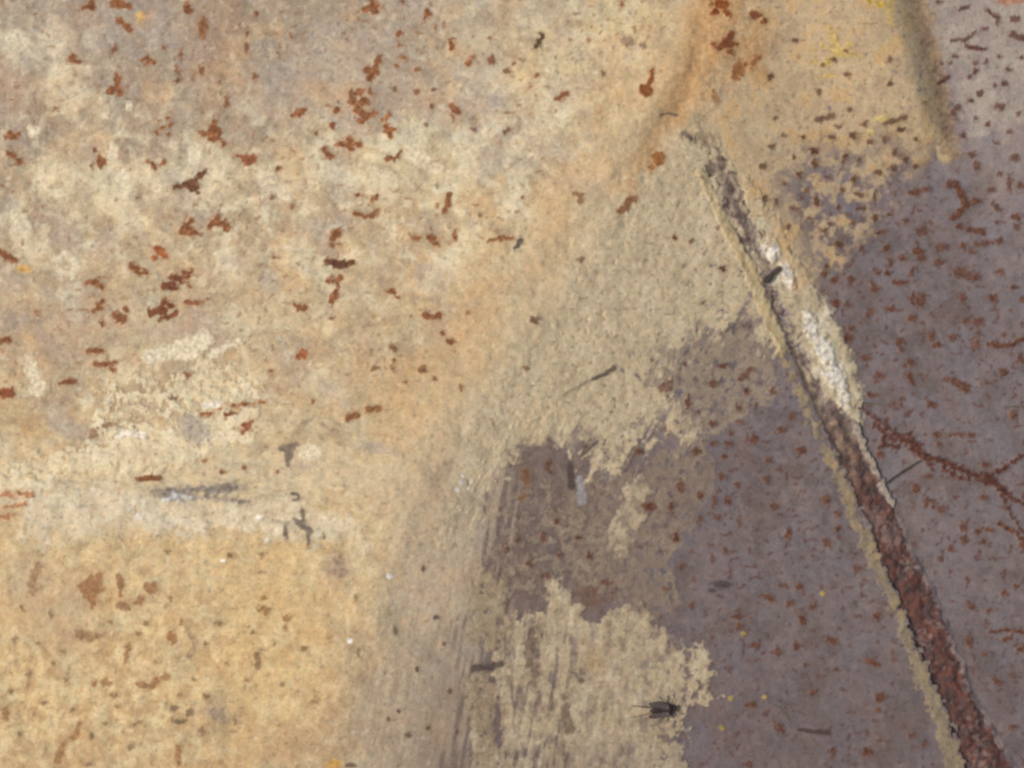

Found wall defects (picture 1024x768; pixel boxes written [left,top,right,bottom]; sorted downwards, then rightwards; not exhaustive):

rust [137,43,259,168]
rust [312,26,479,165]
rust [170,165,210,201]
rust [126,244,212,324]
rust [321,226,359,321]
damp [748,218,898,508]
crack [984,334,1024,351]
rust [198,398,269,438]
damp [566,460,589,507]
crack [855,405,1024,550]
damp [469,660,507,675]
crack [986,625,1024,654]